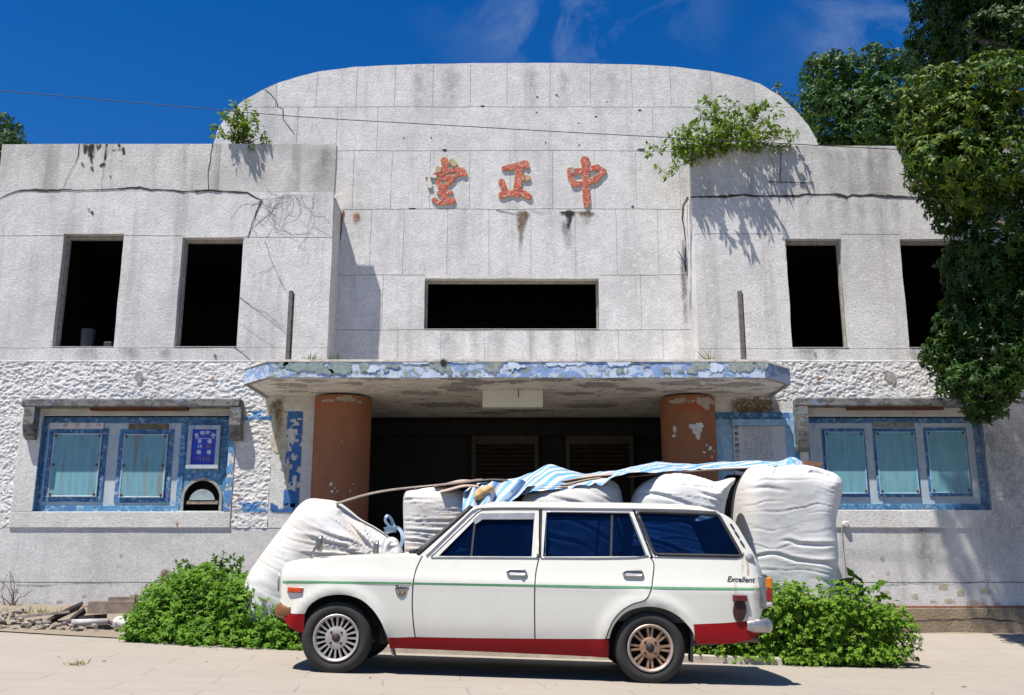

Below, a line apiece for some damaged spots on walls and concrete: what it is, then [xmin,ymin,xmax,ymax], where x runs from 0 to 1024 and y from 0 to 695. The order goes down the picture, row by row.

leakage [81,144,125,177]
crack [0,144,298,296]
leakage [517,211,528,235]
crack [682,151,933,272]
peeling [263,359,768,491]